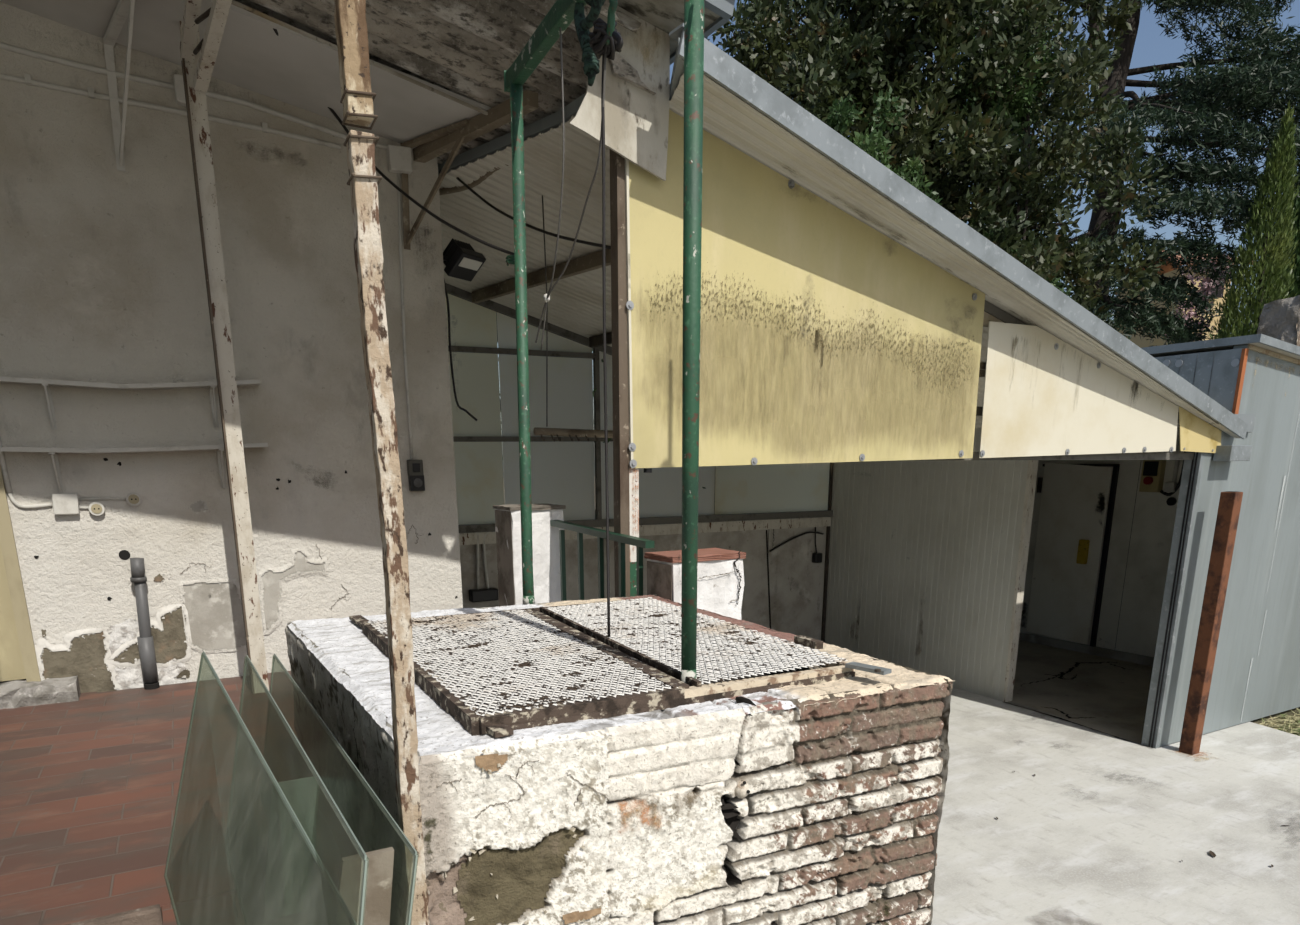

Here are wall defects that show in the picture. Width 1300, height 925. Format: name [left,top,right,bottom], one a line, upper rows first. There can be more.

peeling [35,573,247,693]
peeling [257,548,329,635]
crack [1005,662,1152,748]
crack [721,696,756,885]
flaking render [426,827,585,925]
flaking render [563,905,602,924]